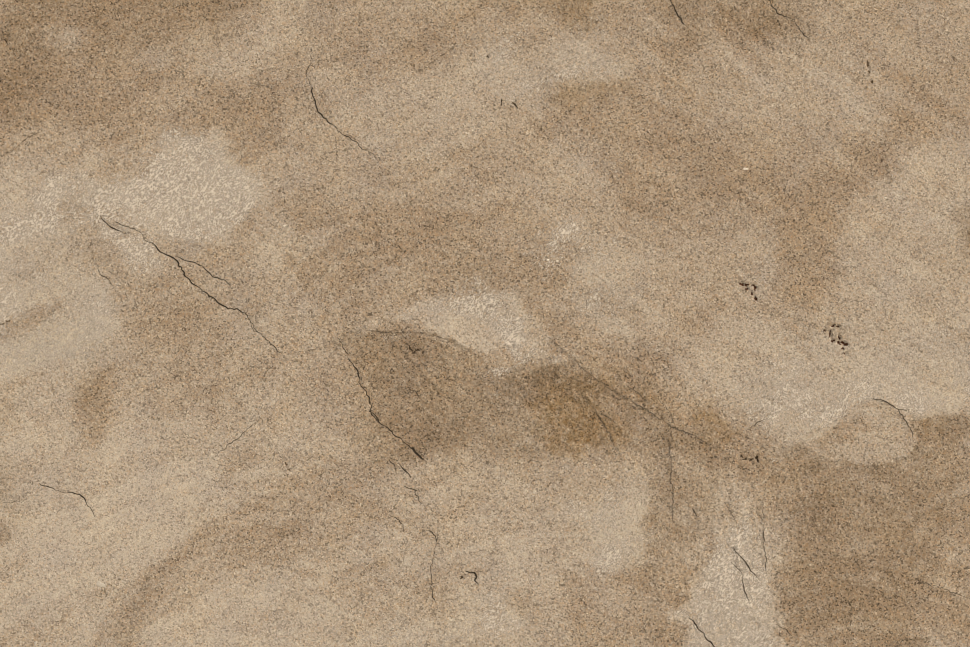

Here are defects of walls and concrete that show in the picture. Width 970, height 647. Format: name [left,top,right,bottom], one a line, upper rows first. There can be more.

crack [306,49,376,159]
crack [100,216,464,503]
crack [391,516,438,602]